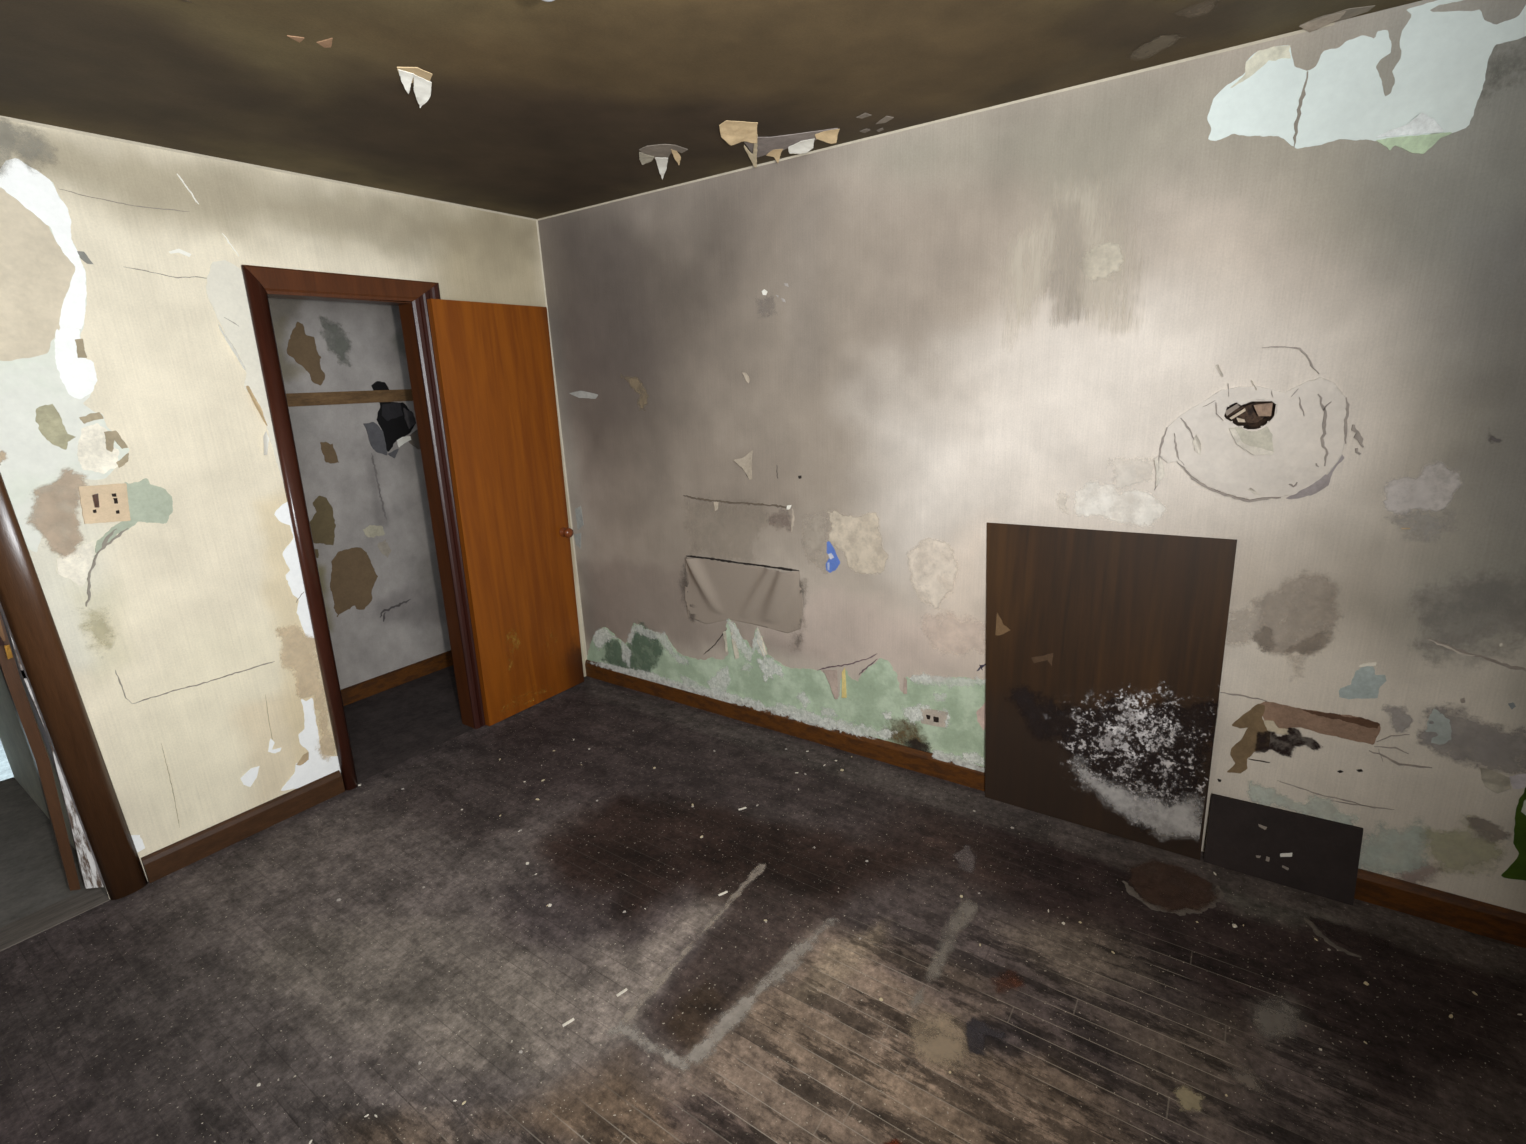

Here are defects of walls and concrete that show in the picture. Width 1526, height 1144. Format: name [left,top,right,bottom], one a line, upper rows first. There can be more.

peeling [1207,0,1526,154]
peeling [639,144,688,180]
peeling [719,120,840,168]
peeling [0,158,173,587]
peeling [206,260,283,481]
peeling [287,322,325,385]
peeling [320,442,339,464]
spalling [364,381,420,458]
peeling [274,496,391,638]
leakage [1227,576,1337,662]
peeling [587,618,986,772]
peeling [1218,662,1386,782]